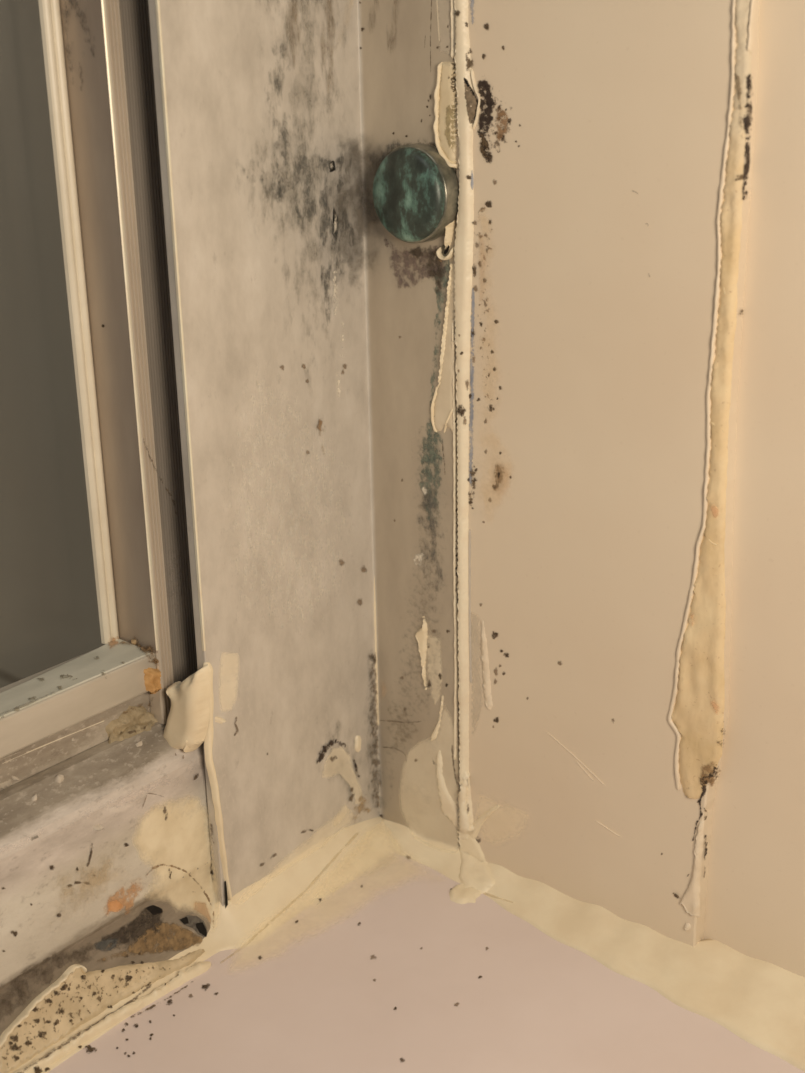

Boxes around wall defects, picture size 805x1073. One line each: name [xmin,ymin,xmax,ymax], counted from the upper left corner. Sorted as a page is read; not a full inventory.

damp [449,49,486,92]
damp [430,105,455,147]
damp [478,80,521,163]
damp [262,123,409,299]
damp [385,239,450,324]
damp [455,201,511,682]
damp [419,421,442,559]
crack [673,802,707,898]